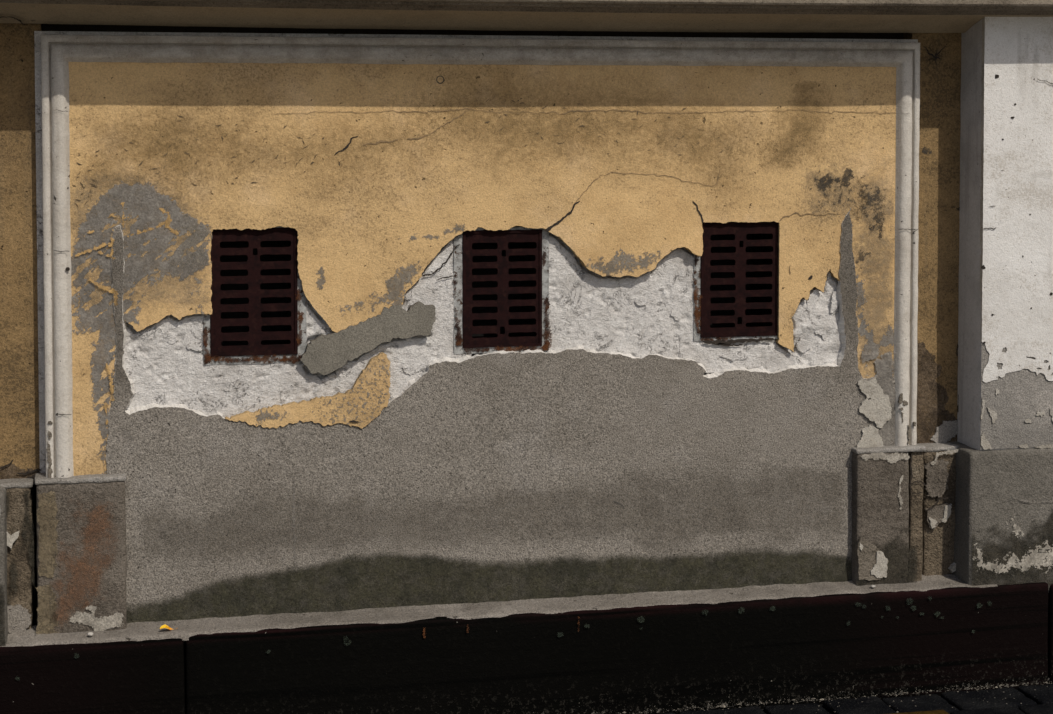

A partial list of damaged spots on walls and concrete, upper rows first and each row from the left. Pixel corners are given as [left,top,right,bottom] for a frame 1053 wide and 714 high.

crack [75,150,103,207]
crack [125,98,908,232]
water stain [848,176,885,238]
rust [202,289,304,364]
spalling [65,180,471,474]
rust [453,275,552,353]
spalling [544,232,842,373]
rust [693,256,734,341]
peeling [856,275,958,448]
peeling [980,341,1053,450]
peeling [0,413,59,634]
water stain [70,477,852,631]